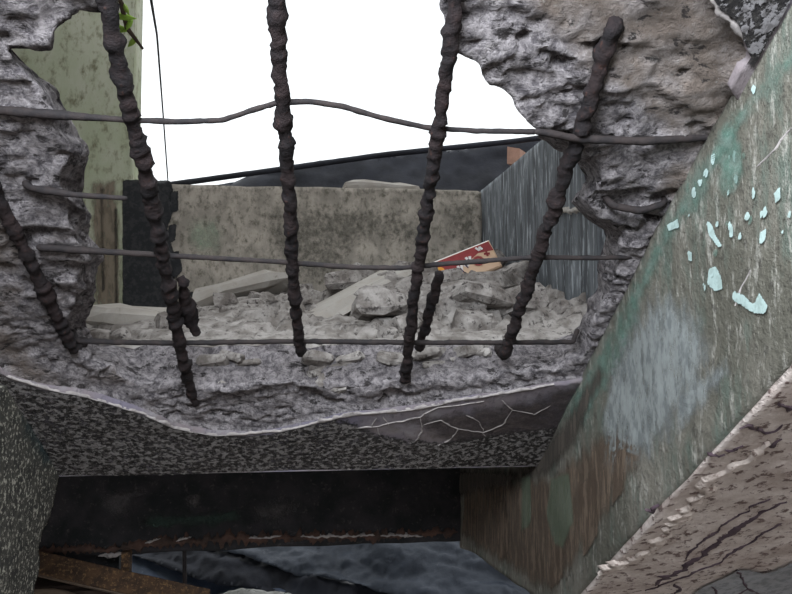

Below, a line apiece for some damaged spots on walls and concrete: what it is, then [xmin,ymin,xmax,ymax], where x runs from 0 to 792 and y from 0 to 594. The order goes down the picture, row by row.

spalling [0,0,747,436]
peeling [732,291,767,314]
crack [645,499,787,591]